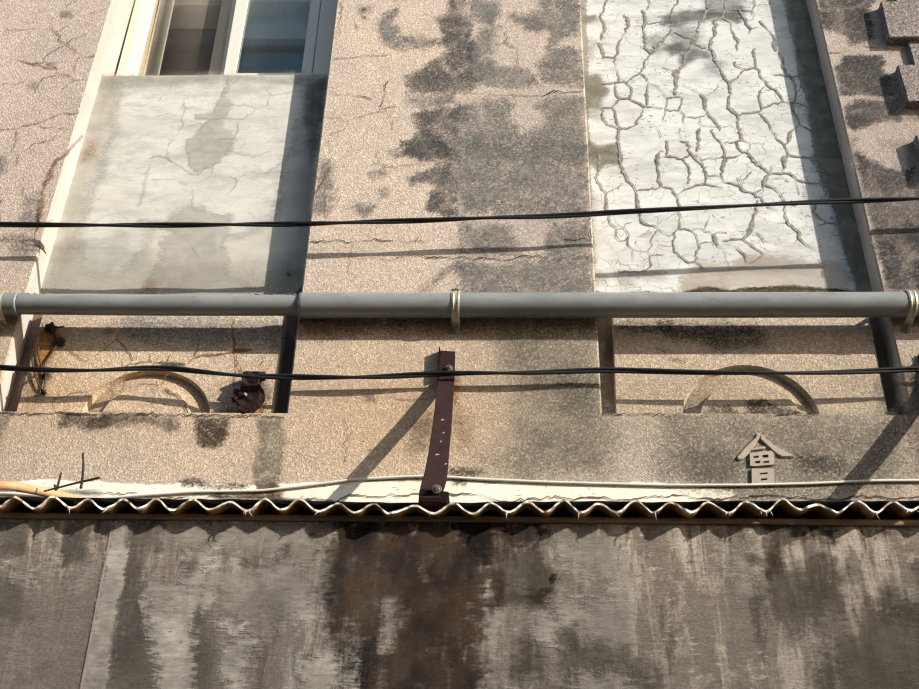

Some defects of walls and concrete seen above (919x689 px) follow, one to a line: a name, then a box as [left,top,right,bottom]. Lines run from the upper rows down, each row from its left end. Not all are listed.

crack [4,0,106,93]
crack [467,32,580,96]
damp [661,0,744,64]
crack [0,112,79,166]
damp [379,0,619,292]
crack [564,0,835,277]
damp [684,0,919,292]
crack [0,188,46,254]
crack [0,319,284,425]
damp [194,416,230,448]
damp [181,478,295,500]
damp [324,507,561,689]